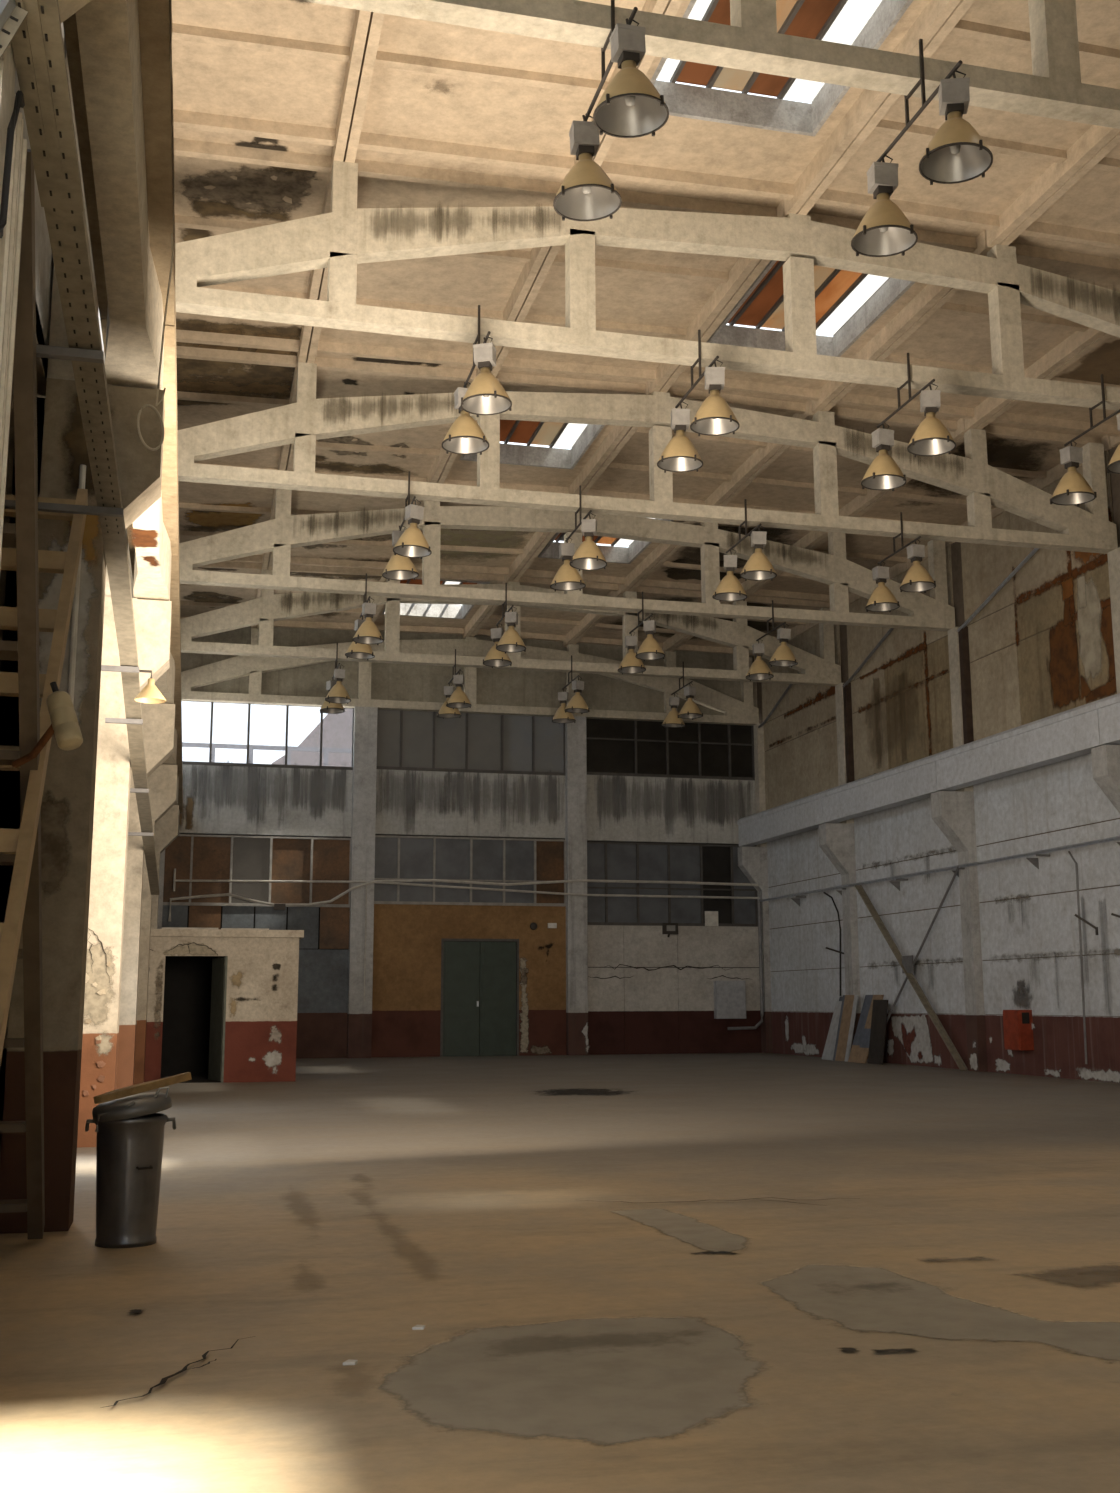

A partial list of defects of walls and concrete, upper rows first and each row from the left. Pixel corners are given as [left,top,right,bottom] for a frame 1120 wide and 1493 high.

leakage [181,137,317,242]
peeling [249,1026,282,1073]
peeling [785,1016,819,1055]
peeling [887,1014,942,1066]
peeling [969,1037,1014,1072]
peeling [1045,1067,1120,1083]
crack [100,1336,255,1408]